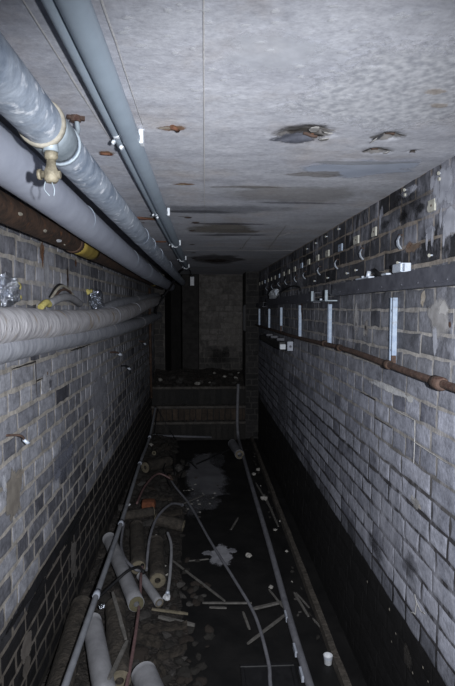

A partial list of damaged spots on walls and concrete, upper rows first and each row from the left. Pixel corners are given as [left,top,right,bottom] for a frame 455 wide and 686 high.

corrosion [159,125,185,133]
spalling [270,125,334,143]
spalling [363,131,405,154]